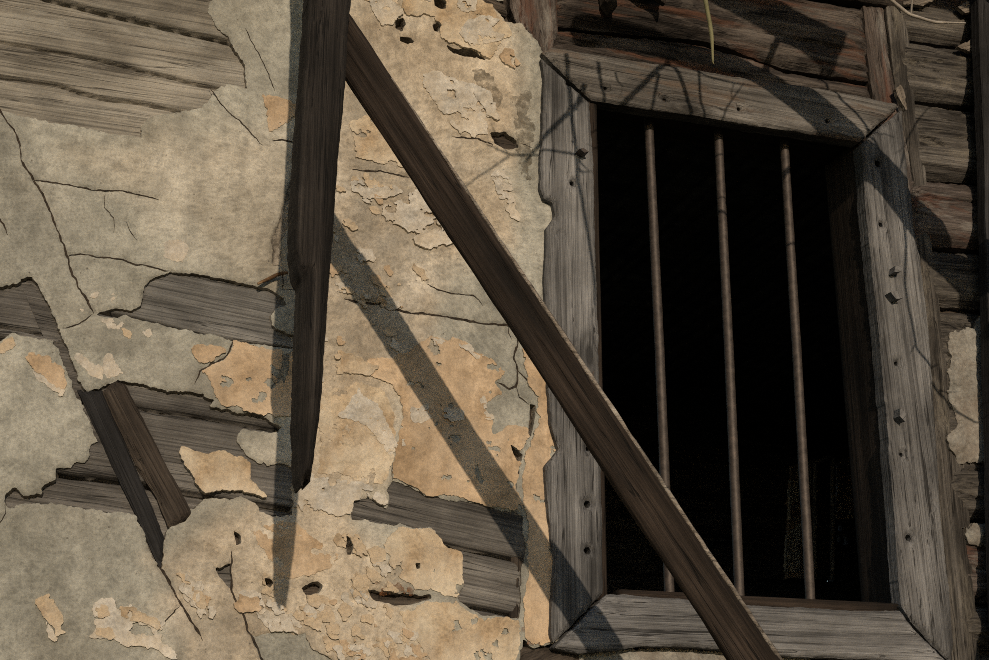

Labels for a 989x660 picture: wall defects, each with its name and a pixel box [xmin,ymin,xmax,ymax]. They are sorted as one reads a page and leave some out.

crack [0,109,167,328]
spalling [0,0,247,138]
crack [210,88,293,144]
peeling [262,94,296,132]
peeling [333,115,453,250]
peeling [365,0,521,69]
peeling [423,70,518,150]
peeling [0,239,556,660]